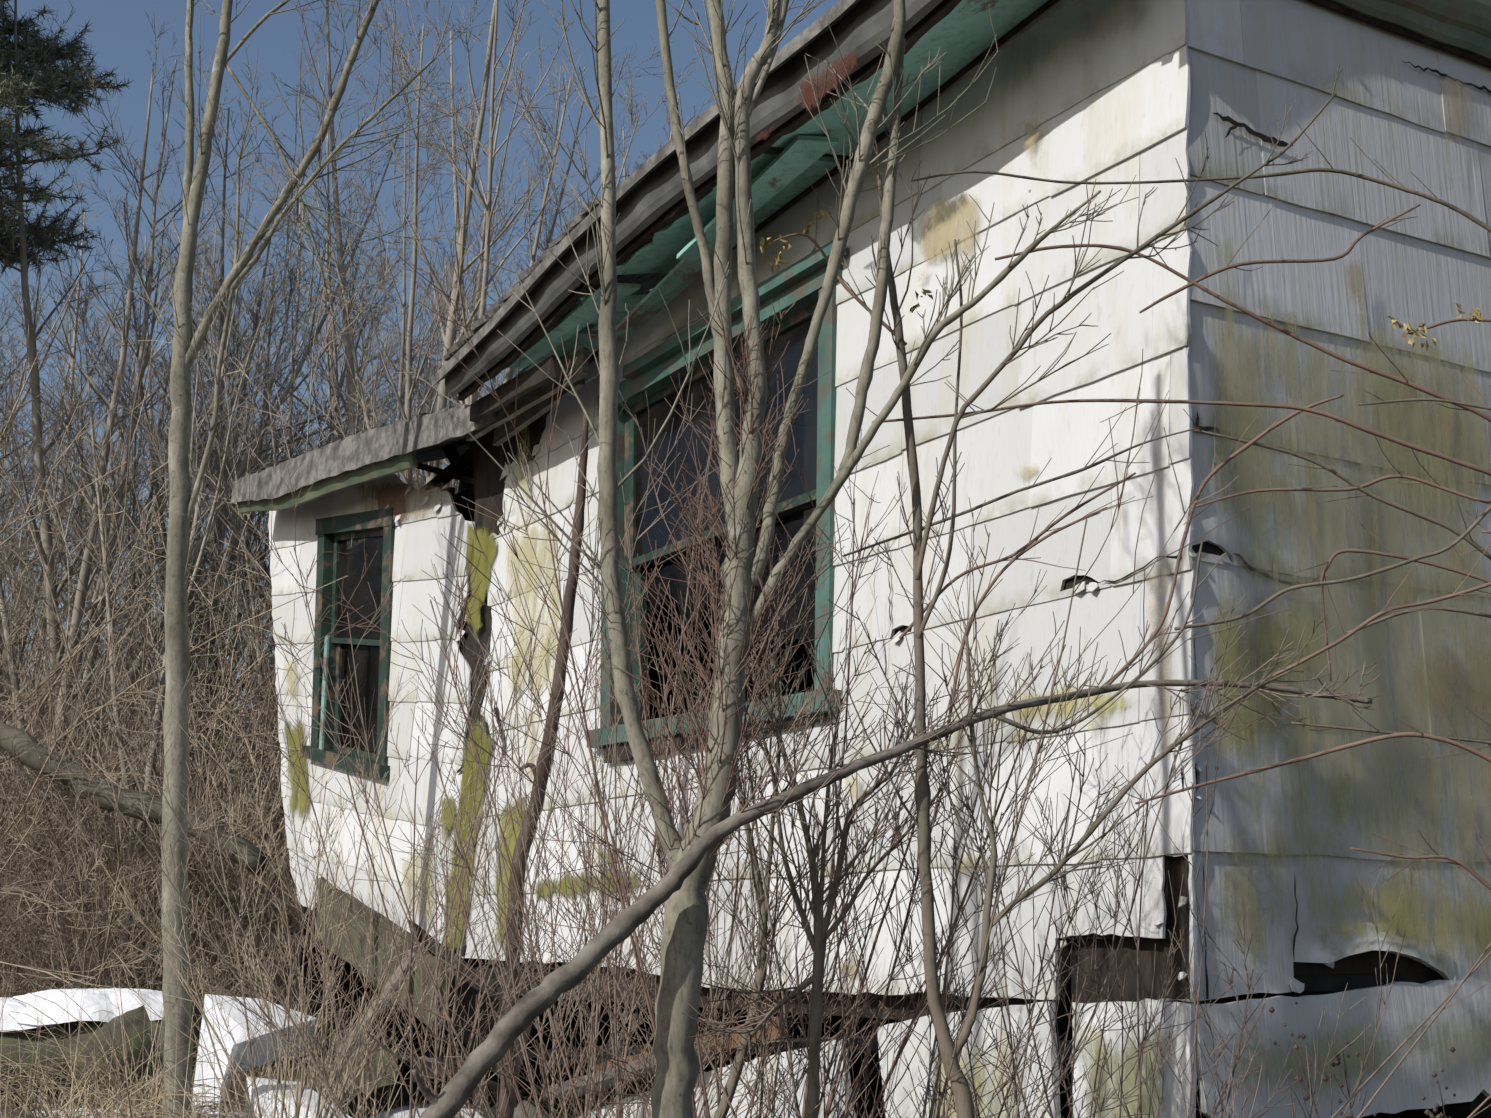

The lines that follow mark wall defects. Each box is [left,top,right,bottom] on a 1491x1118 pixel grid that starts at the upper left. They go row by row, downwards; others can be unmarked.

crack [1401,60,1491,94]
crack [1213,113,1293,147]
leakage [921,199,976,276]
leakage [1343,319,1488,525]
peeling [1074,581,1098,593]
peeling [1290,978,1305,993]